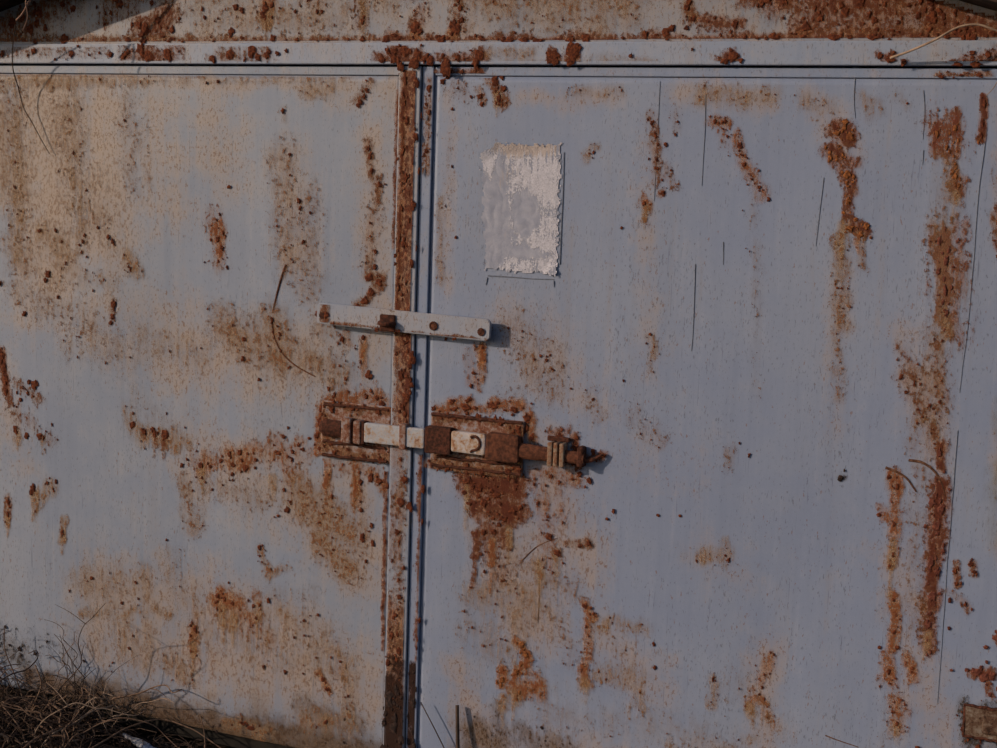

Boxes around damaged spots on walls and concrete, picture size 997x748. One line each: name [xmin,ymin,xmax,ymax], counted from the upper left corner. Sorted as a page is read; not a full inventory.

rust [0,0,955,311]
rust [794,94,873,402]
rust [934,30,997,79]
rust [0,75,797,748]
rust [956,695,997,748]